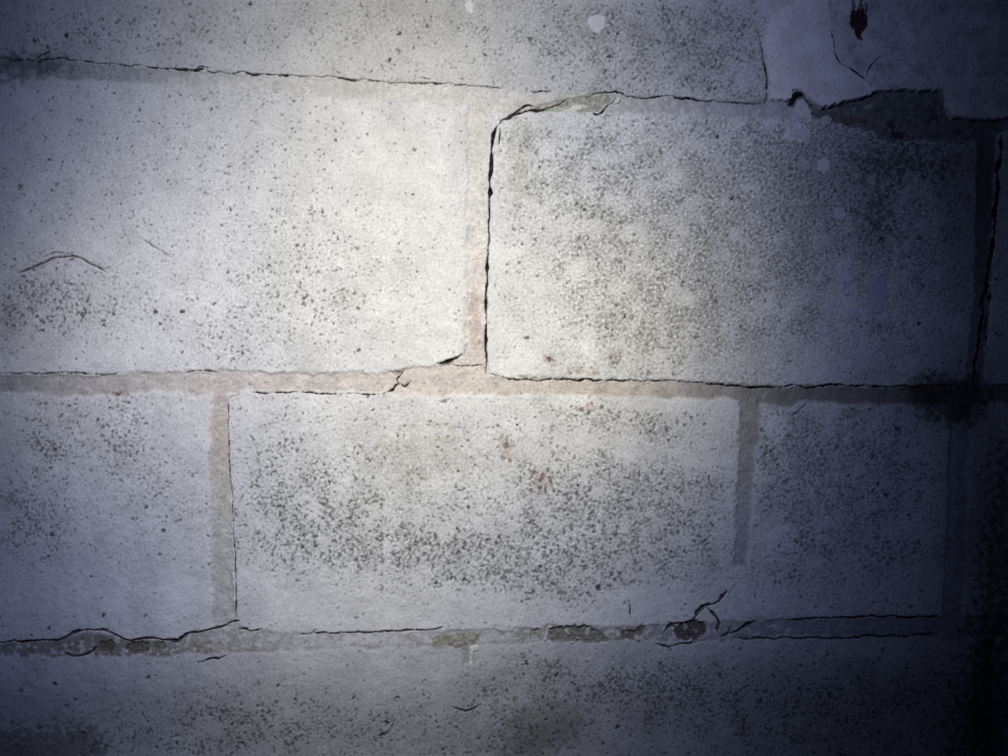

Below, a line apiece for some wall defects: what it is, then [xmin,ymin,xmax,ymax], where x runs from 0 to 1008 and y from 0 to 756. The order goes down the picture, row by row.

crack [1,49,499,88]
crack [591,30,768,115]
crack [830,30,882,87]
peeling [763,0,1008,146]
crack [17,252,111,273]
crack [442,91,1003,389]
crack [12,370,119,378]
crack [0,372,410,657]
crack [300,627,442,635]
spalling [674,619,707,641]
crack [659,591,938,648]